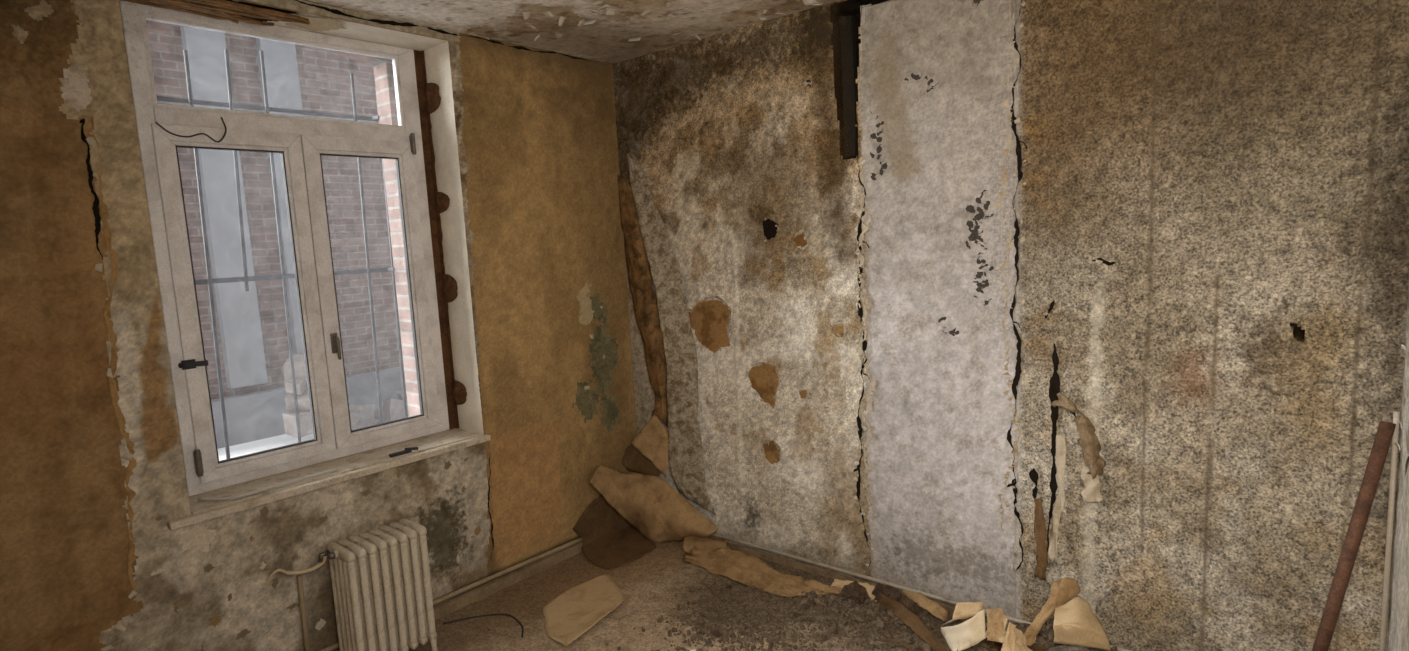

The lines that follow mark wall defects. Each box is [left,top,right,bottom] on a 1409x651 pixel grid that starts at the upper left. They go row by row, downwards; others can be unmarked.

peeling [11,0,54,44]
crack [79,119,103,259]
flaking render [246,0,824,428]
flaking render [59,0,491,651]
leakage [571,283,620,433]
flaking render [833,0,1020,623]
crack [994,1,1077,587]
peeling [763,439,781,465]
leakage [419,487,473,578]